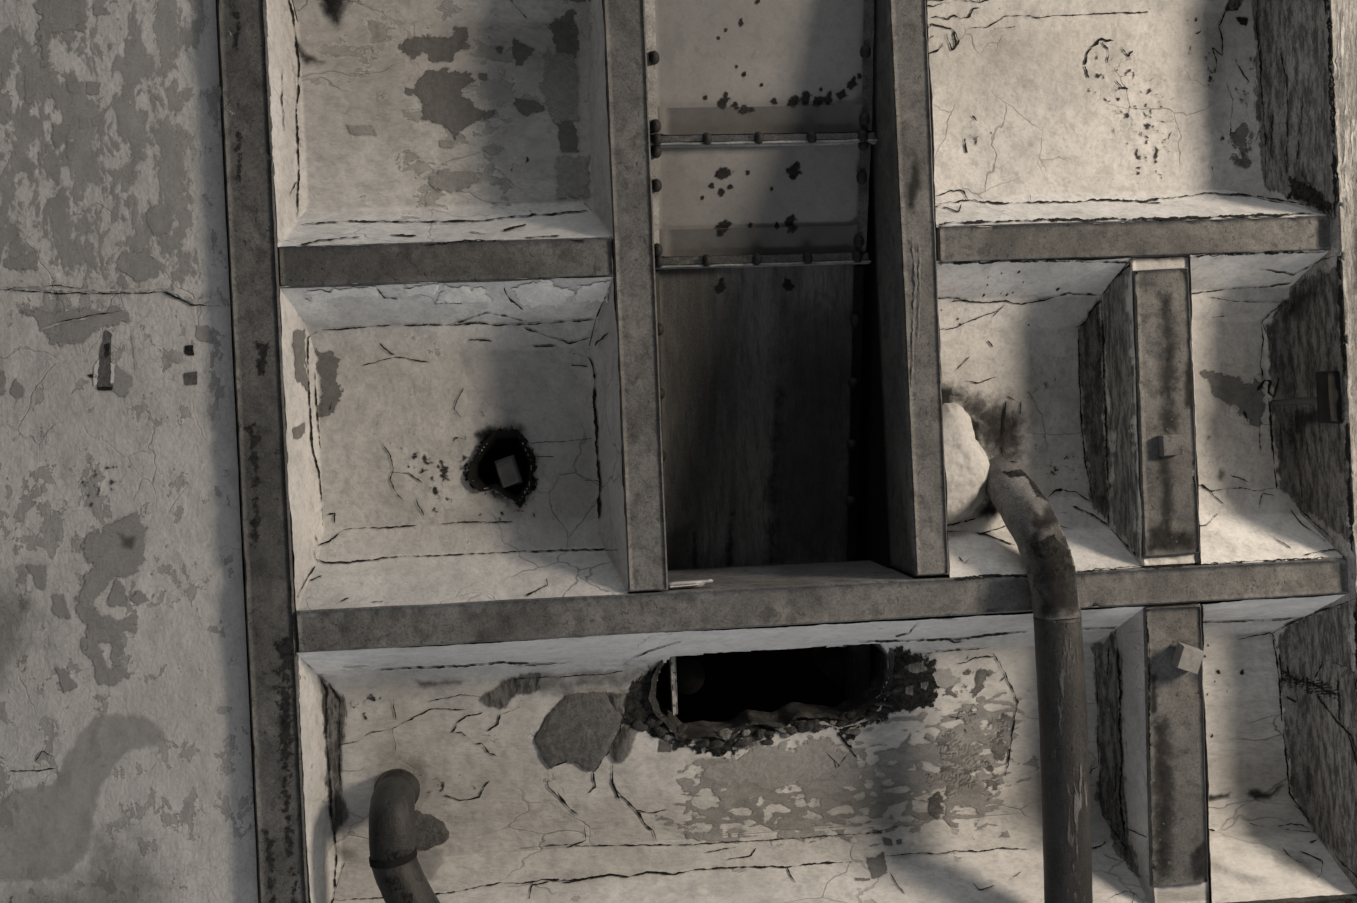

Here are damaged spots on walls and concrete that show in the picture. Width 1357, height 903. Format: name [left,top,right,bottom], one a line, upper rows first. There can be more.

peeling [0,0,243,398]
peeling [399,26,496,148]
rust [701,167,750,200]
rust [703,92,755,114]
rust [771,74,862,108]
crack [927,0,1324,225]
crack [297,313,617,602]
spalling [463,427,538,508]
crack [320,642,680,903]
crack [435,725,1020,898]
peeling [621,646,1039,881]
rust [1063,764,1088,902]